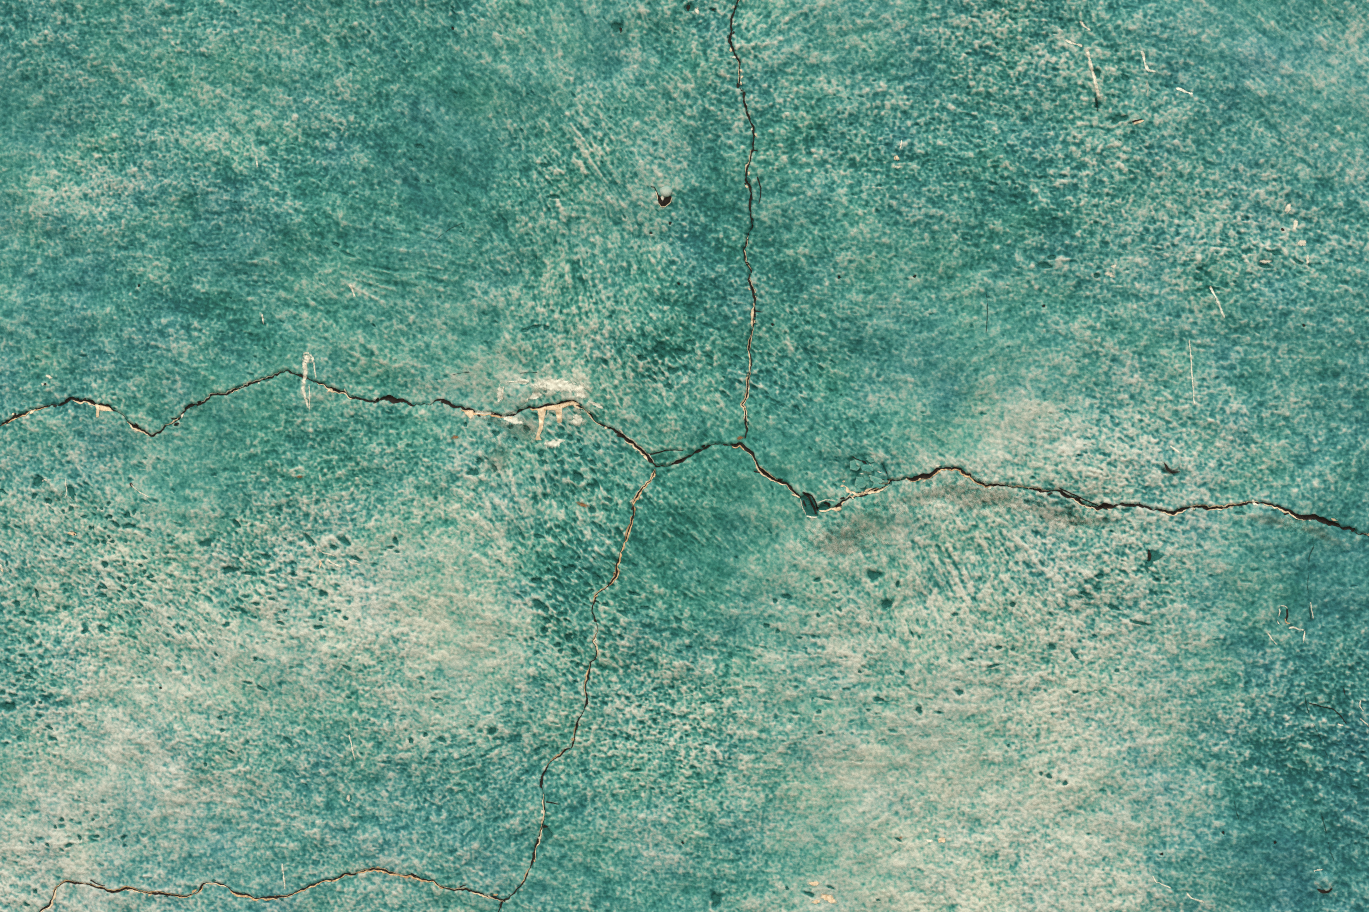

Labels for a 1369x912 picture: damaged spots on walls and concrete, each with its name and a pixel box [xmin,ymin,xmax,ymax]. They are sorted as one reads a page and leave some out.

crack [0,0,819,912]
crack [829,465,1369,536]
crack [1306,544,1314,619]
crack [1305,688,1347,758]